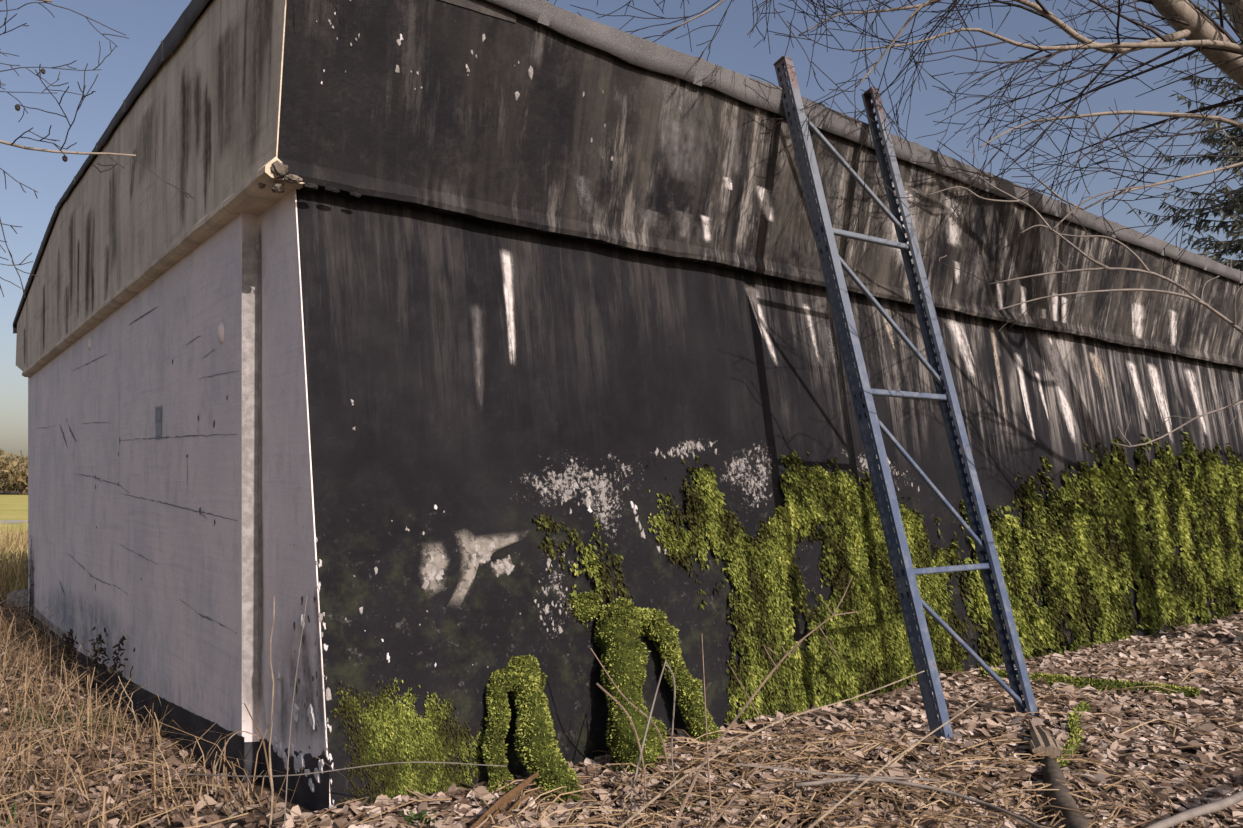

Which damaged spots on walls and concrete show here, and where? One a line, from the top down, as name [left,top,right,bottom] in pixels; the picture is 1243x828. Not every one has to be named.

leakage [503,253,515,360]
leakage [748,287,776,360]
leakage [950,322,974,375]
leakage [1021,283,1067,323]
crack [43,393,237,441]
leakage [1016,335,1075,438]
leakage [1119,360,1171,437]
crack [73,468,237,521]
spalling [405,526,448,591]
spalling [452,533,518,601]
spalling [293,559,328,653]
peeling [273,669,333,792]